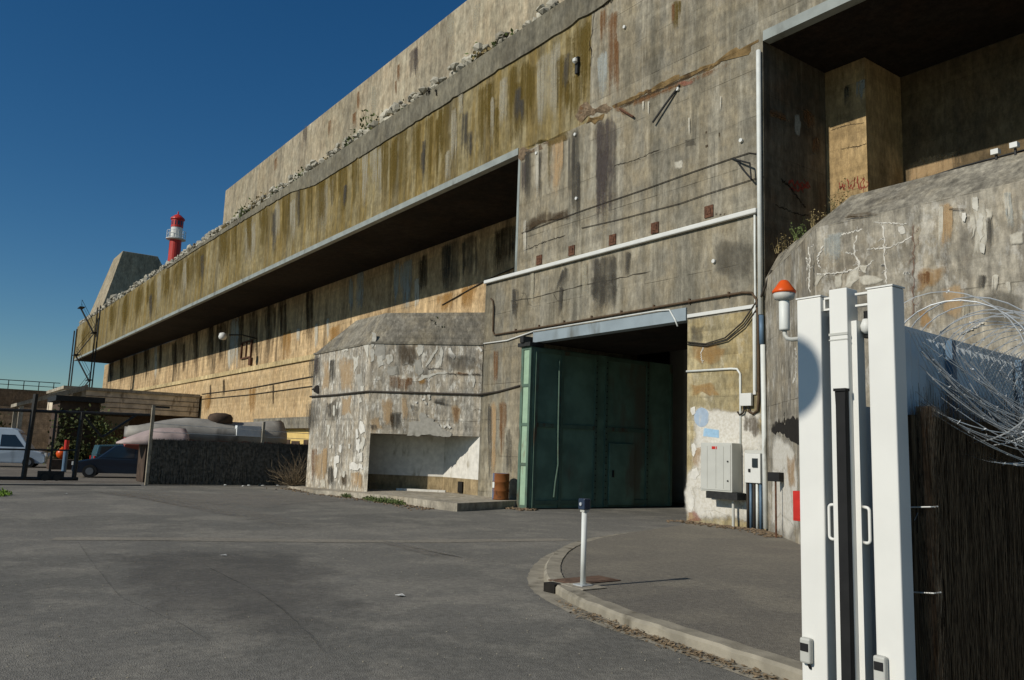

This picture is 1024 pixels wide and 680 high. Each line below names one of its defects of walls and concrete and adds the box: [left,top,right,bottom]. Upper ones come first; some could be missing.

damp [555,23,607,109]
damp [382,85,498,188]
damp [525,132,580,215]
damp [110,246,205,329]
damp [495,210,563,259]
crack [806,221,912,292]
peeling [962,197,992,254]
peeling [1003,193,1024,244]
damp [110,291,329,381]
peeling [312,332,460,479]
peeling [687,443,699,521]
peeling [771,412,799,537]